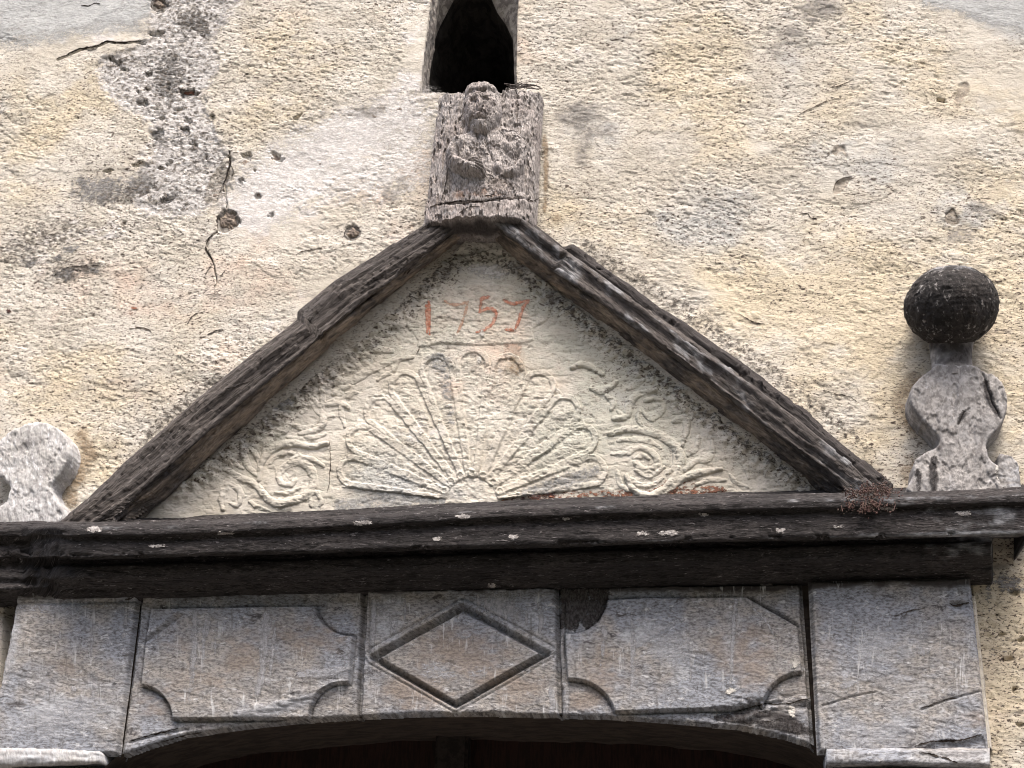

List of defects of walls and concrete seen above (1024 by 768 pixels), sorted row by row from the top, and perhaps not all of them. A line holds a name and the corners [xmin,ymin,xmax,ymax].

crack [57,40,147,59]
peeling [95,0,438,233]
crack [217,151,234,208]
spalling [344,226,361,241]
damp [559,588,609,667]